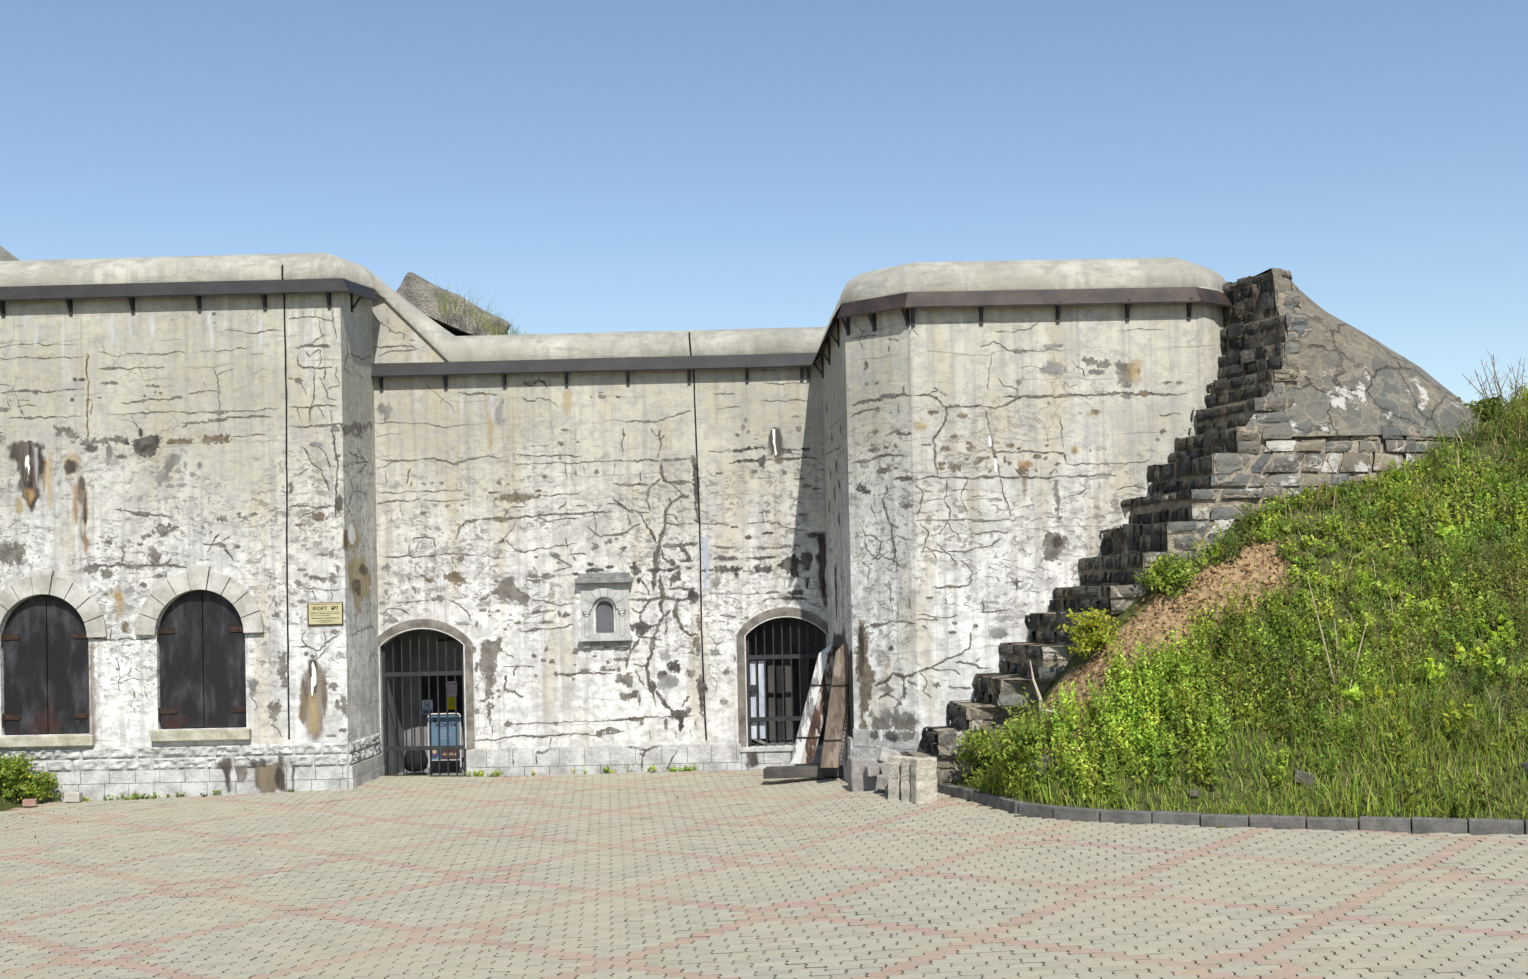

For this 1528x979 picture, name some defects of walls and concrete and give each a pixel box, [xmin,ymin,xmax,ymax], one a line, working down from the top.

rust [73,477,88,552]
crack [0,311,1187,771]
spalling [379,526,813,735]
damp [833,619,875,738]